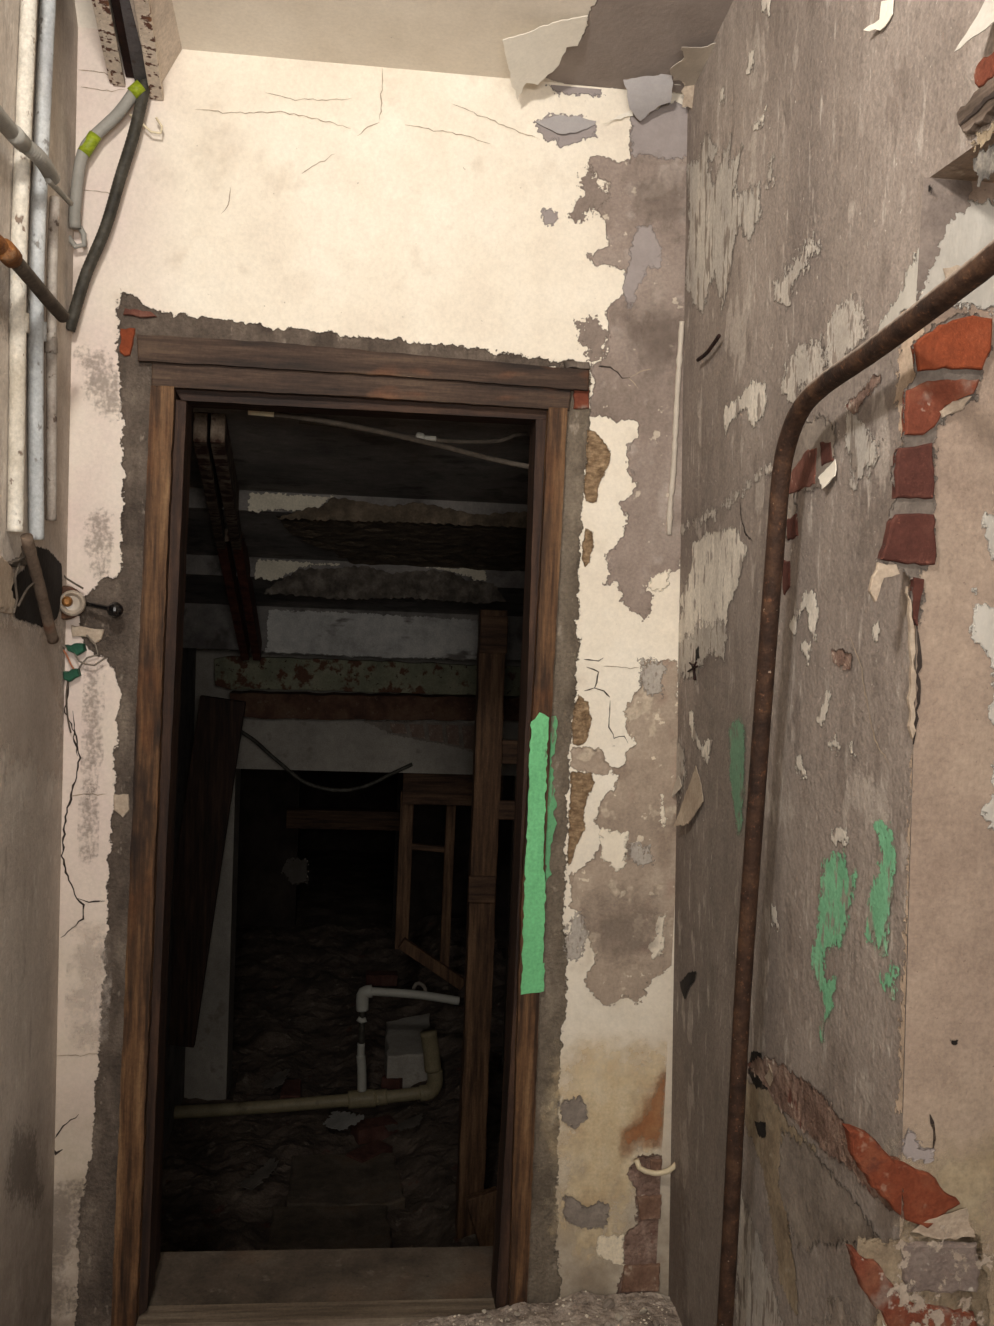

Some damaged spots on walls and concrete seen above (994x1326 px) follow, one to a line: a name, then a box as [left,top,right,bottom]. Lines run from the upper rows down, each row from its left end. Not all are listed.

crack [82,70,126,92]
crack [196,71,540,173]
peeling [864,0,894,31]
peeling [954,0,994,52]
flaking render [973,52,994,88]
peeling [878,198,994,331]
flaking render [785,412,837,541]
flaking render [846,275,994,669]
peeling [0,0,733,1326]
peeling [969,587,994,725]
crack [61,685,104,937]
flaking render [745,1051,993,1326]